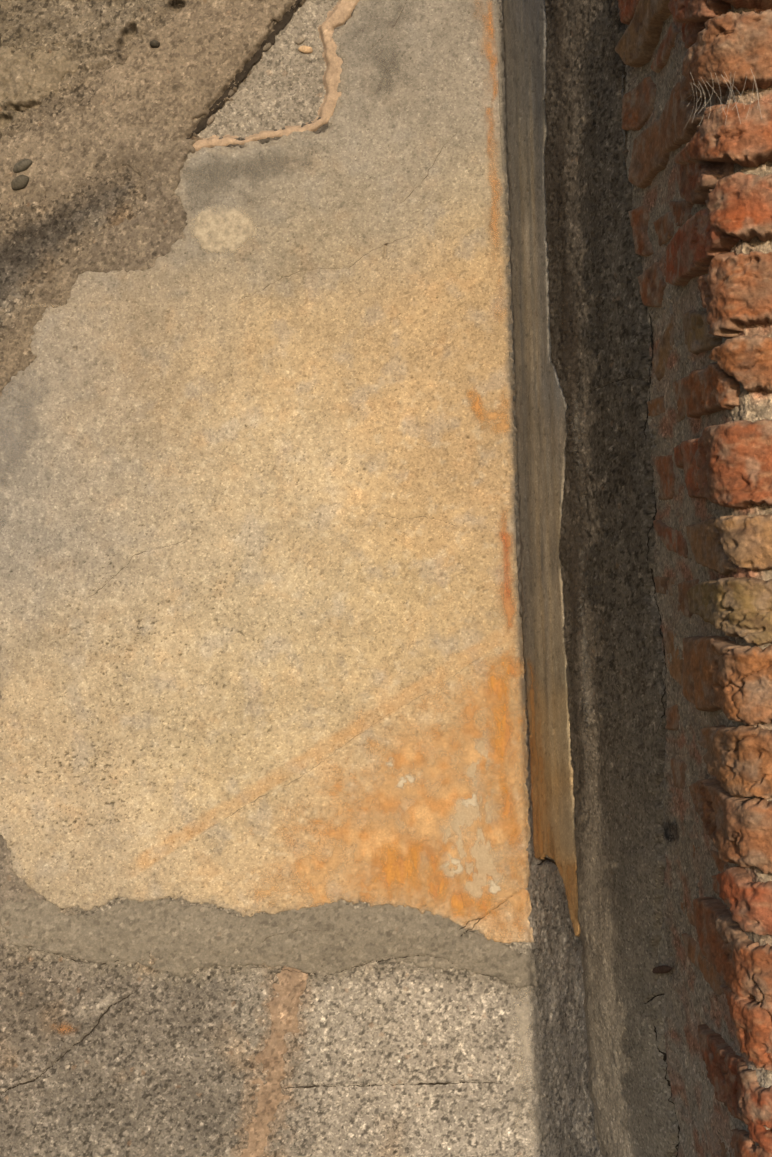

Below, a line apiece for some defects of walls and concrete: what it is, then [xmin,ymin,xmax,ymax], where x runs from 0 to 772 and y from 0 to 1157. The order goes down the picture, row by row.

spalling [195,0,339,139]
rust [297,662,530,915]
crack [0,985,144,1100]
crack [285,1081,497,1089]